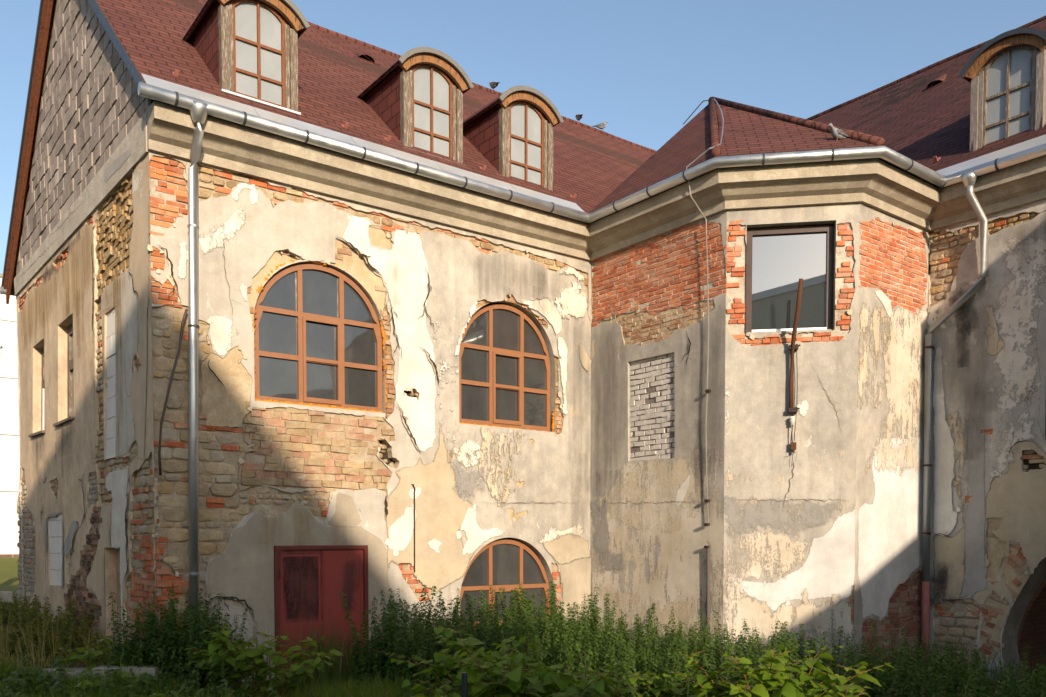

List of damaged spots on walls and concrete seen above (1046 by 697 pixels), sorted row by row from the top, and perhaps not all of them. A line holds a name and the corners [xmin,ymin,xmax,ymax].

flaking render [64,155,1046,673]
water stain [590,500,624,573]